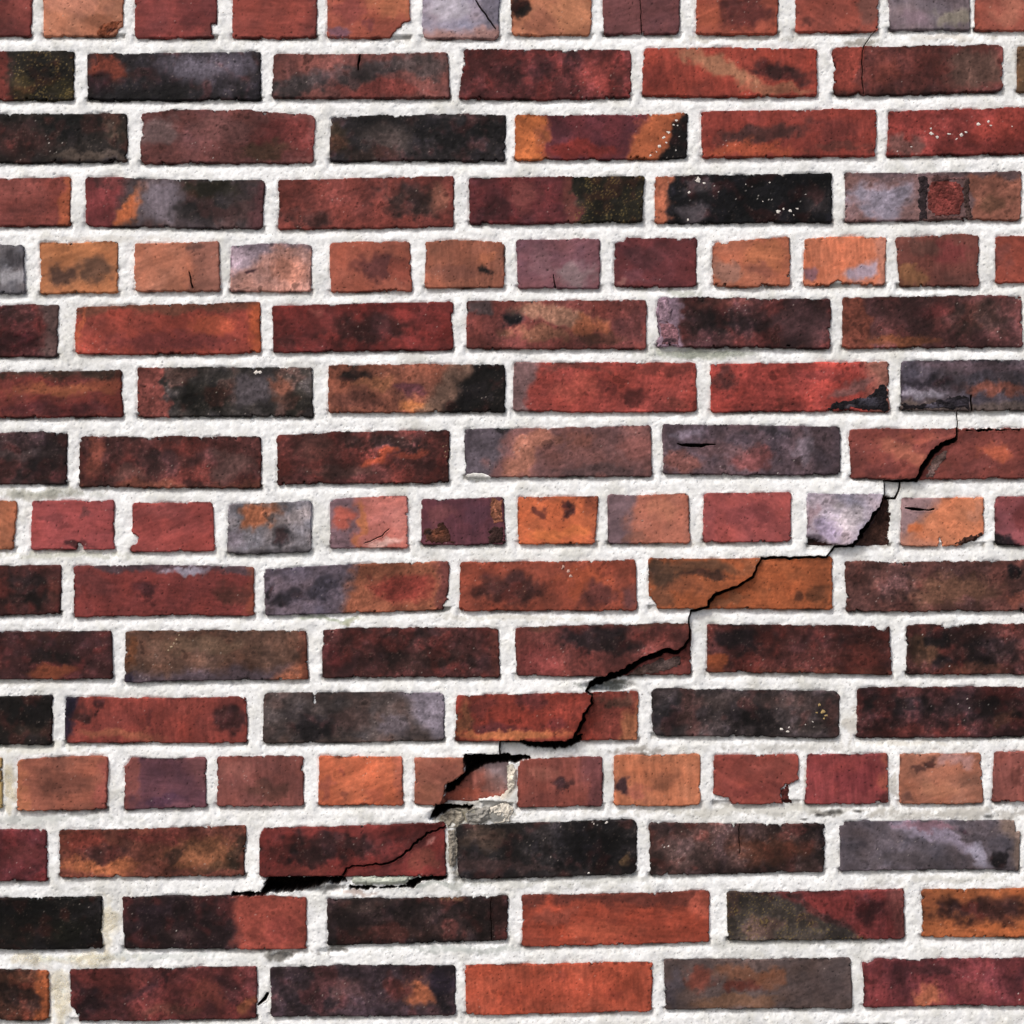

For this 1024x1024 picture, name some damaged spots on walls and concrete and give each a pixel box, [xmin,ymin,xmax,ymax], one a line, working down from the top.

spalling [859,501,891,546]
crack [230,393,1022,899]
spalling [442,764,517,867]